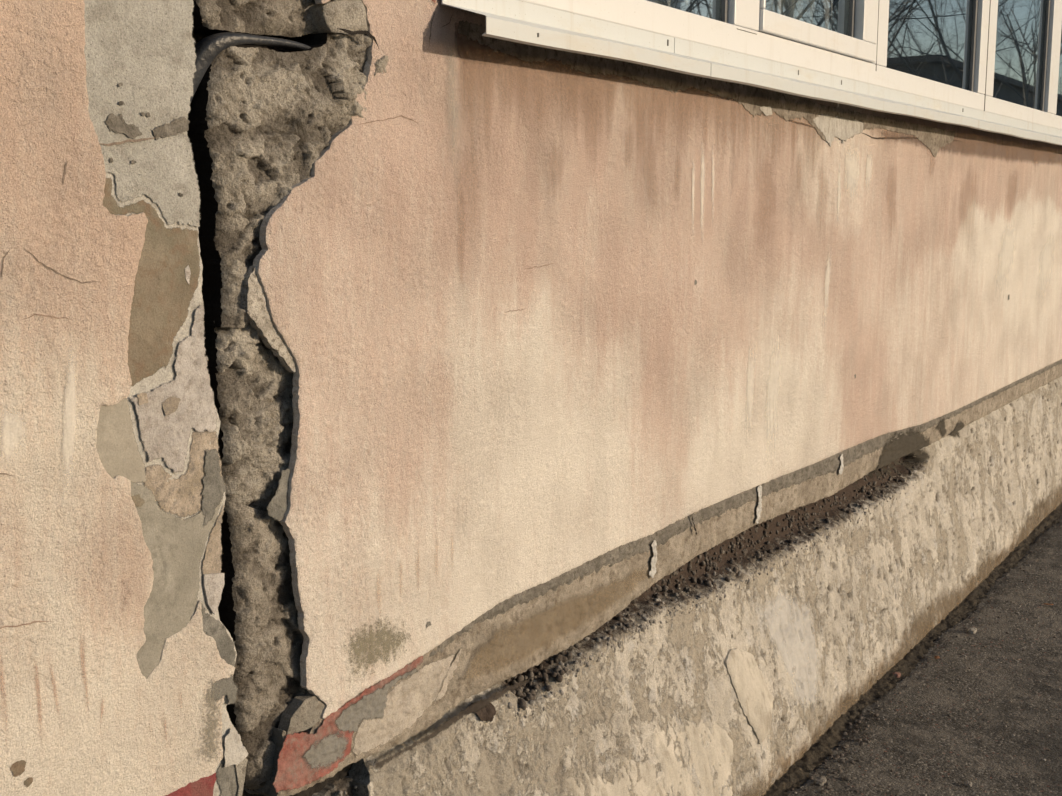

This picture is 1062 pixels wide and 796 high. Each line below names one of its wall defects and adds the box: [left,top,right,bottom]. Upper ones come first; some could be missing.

crack [192,32,210,45]
crack [236,38,292,52]
water stain [457,36,629,78]
peeling [458,20,955,157]
water stain [941,138,1062,163]
water stain [692,158,714,218]
spalling [84,0,462,796]
water stain [345,620,411,674]
crack [289,679,530,796]
crack [242,788,264,796]